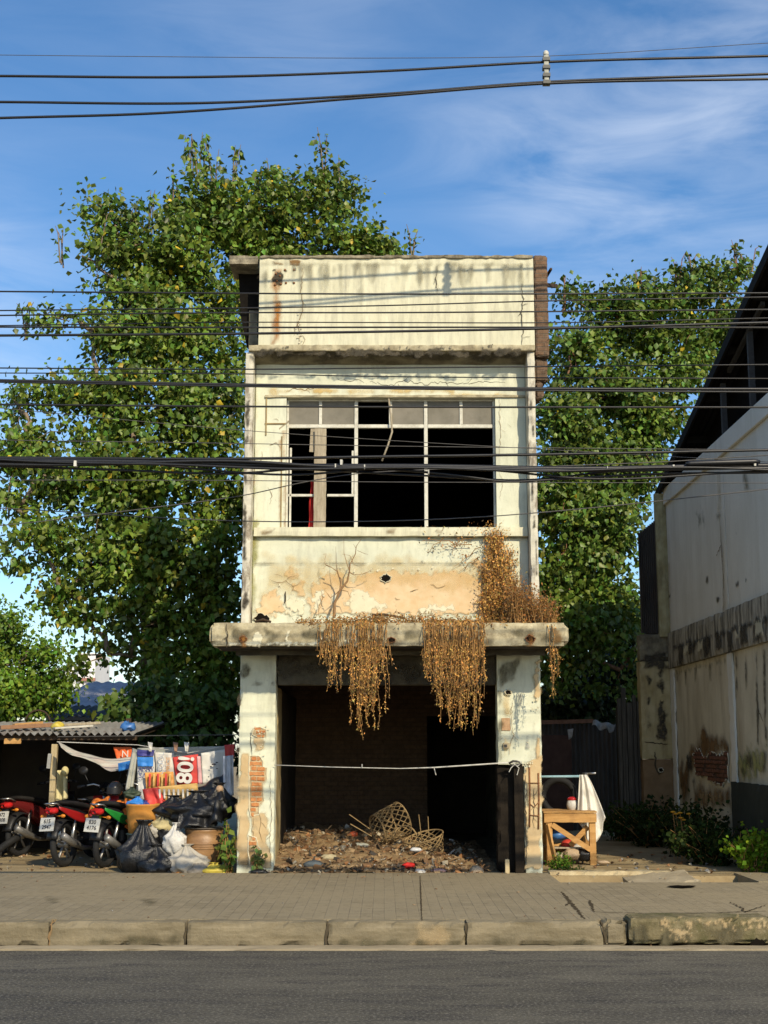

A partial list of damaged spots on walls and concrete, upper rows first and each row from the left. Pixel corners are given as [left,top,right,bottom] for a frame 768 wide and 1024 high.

flaking render [229,559,492,646]
water stain [644,616,767,740]
flaking render [236,726,271,868]
flaking render [692,748,729,787]
crack [561,892,634,945]
crack [702,902,765,913]